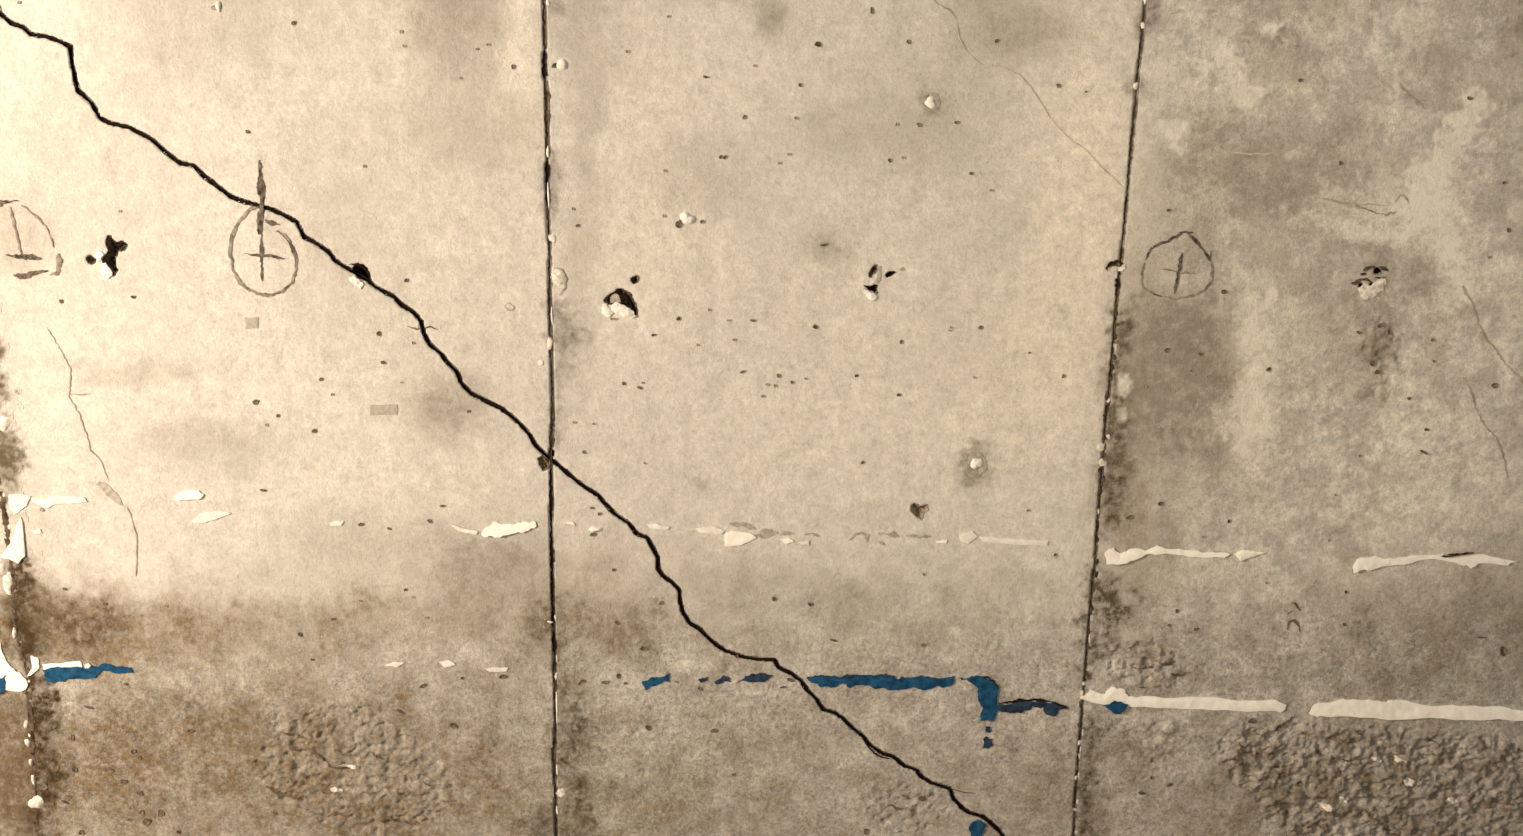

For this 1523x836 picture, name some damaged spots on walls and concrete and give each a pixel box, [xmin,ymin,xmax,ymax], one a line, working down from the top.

crack [932,0,1122,186]
hole [86,235,128,279]
hole [601,275,639,320]
hole [864,265,895,301]
spalling [1352,265,1407,409]
crack [0,7,1005,836]
peeling [0,494,87,564]
water stain [419,523,562,614]
water stain [0,537,159,836]